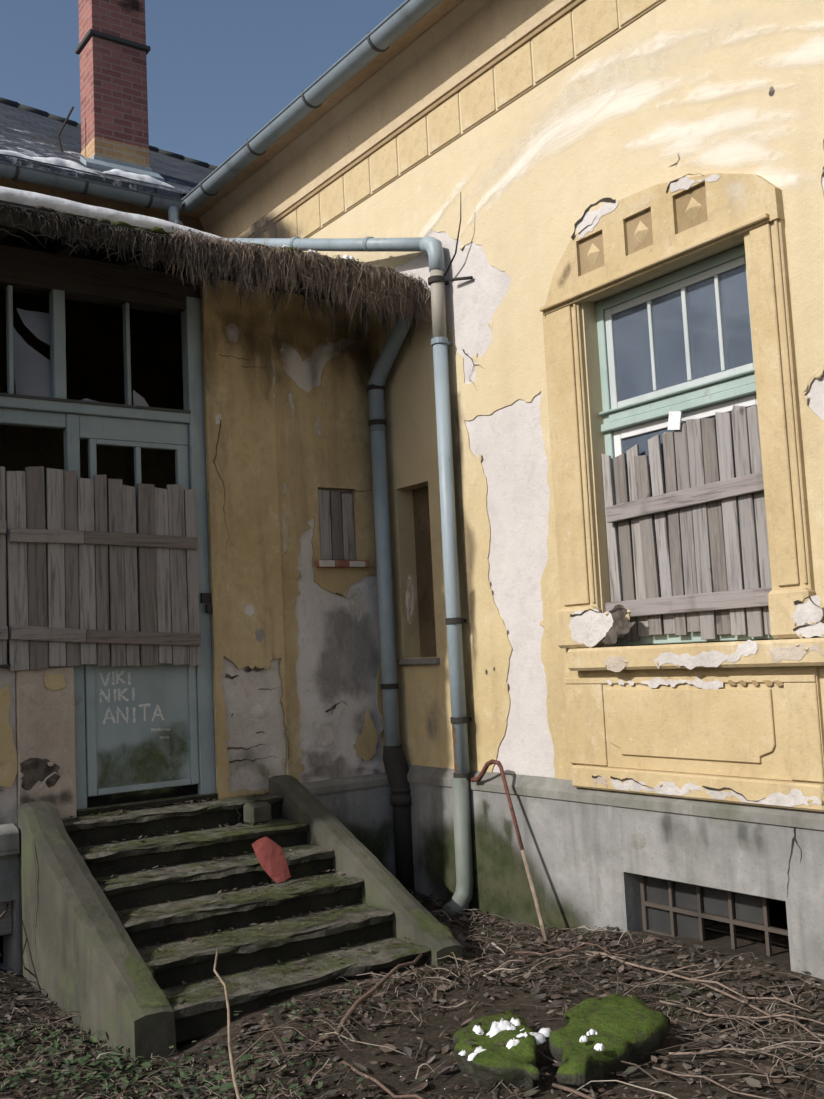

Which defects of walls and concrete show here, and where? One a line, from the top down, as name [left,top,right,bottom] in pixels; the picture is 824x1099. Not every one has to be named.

flaking render [666,173,720,193]
flaking render [571,197,619,239]
flaking render [395,252,431,291]
flaking render [426,230,511,384]
flaking render [278,332,360,392]
flaking render [800,369,824,421]
flaking render [465,393,555,778]
flaking render [220,518,384,793]
leakage [319,589,379,698]
flaking render [569,595,824,690]
spalling [592,775,823,807]
crack [787,827,802,894]